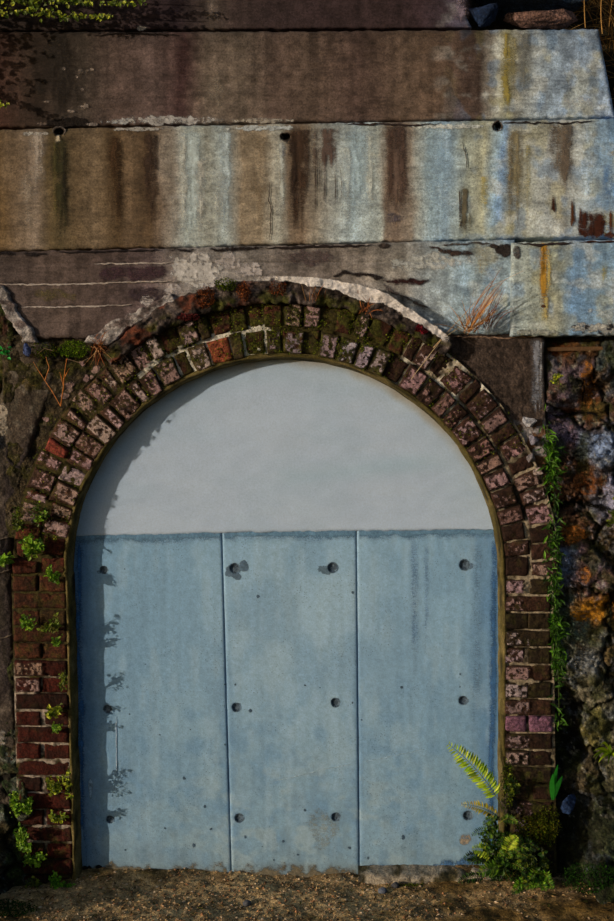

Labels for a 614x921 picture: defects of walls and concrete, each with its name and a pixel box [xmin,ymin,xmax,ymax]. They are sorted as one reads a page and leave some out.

water stain [22,132,68,226]
water stain [107,115,373,232]
water stain [385,123,488,223]
water stain [459,188,471,230]
rust [570,201,614,238]
rust [540,243,551,319]